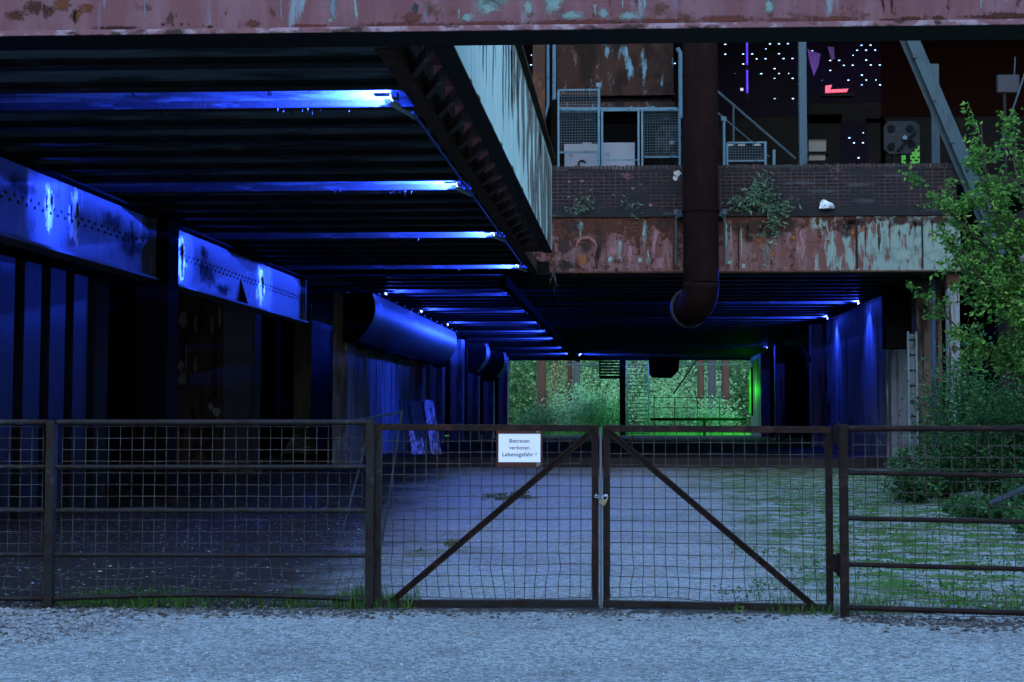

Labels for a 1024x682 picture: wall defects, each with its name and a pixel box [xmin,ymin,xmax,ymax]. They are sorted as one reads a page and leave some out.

corrosion [557,220,604,271]
corrosion [735,218,796,257]
corrosion [835,215,954,256]
peeling [870,223,956,264]